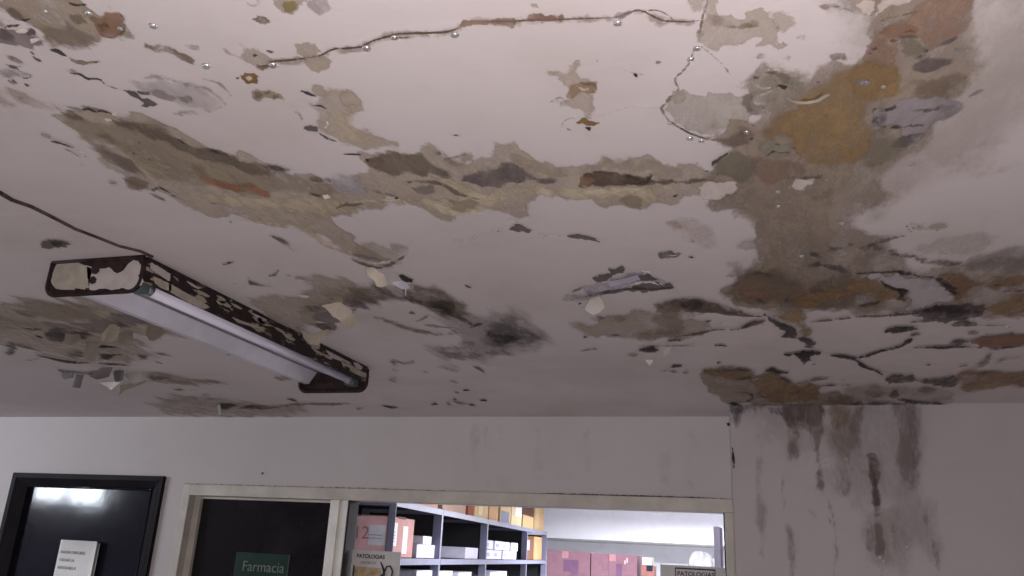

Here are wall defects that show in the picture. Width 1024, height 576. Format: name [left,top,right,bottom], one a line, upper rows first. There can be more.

peeling [301,85,398,150]
crack [260,0,728,141]
peeling [753,68,830,104]
peeling [498,219,531,233]
peeling [567,234,606,242]
peeling [0,296,219,395]
peeling [248,270,368,345]
leakage [309,286,544,360]
peeling [574,266,674,315]
leakage [573,311,710,374]
leakage [701,362,899,489]
leakage [867,453,885,575]